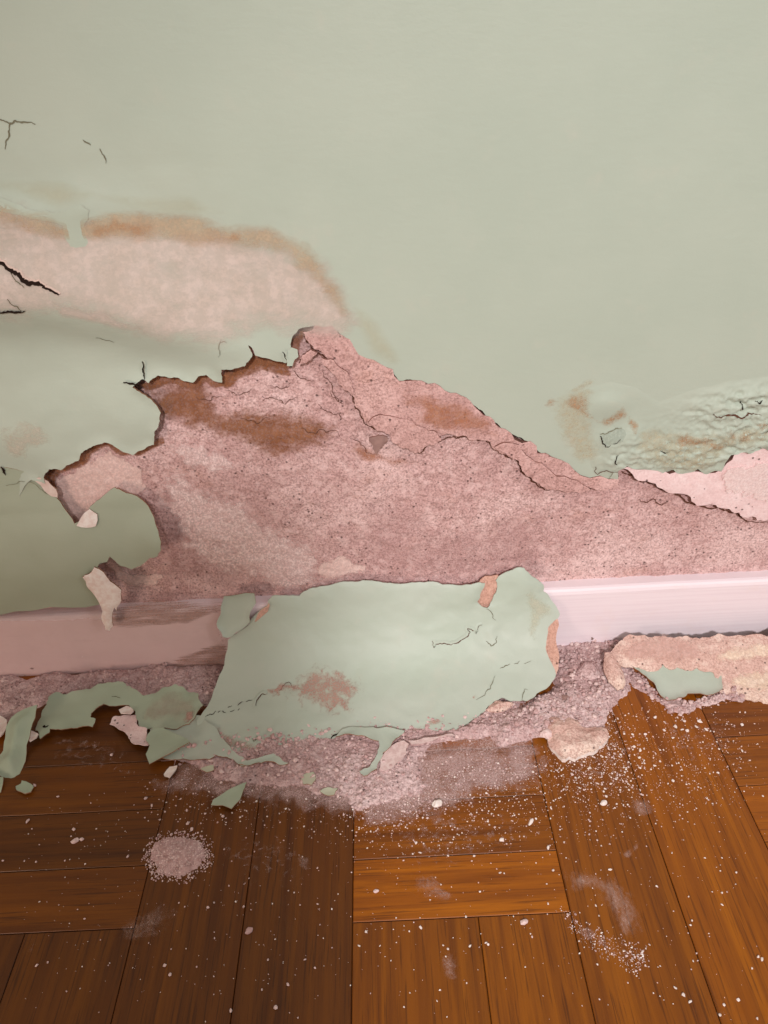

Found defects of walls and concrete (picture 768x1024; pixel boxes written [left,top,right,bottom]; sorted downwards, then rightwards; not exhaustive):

crack [0,119,35,149]
crack [0,258,60,314]
damp [0,212,347,349]
damp [143,354,325,455]
crack [714,400,763,419]
spalling [0,326,768,631]
crack [594,428,621,478]
crack [432,610,528,700]
peeling [146,728,190,778]